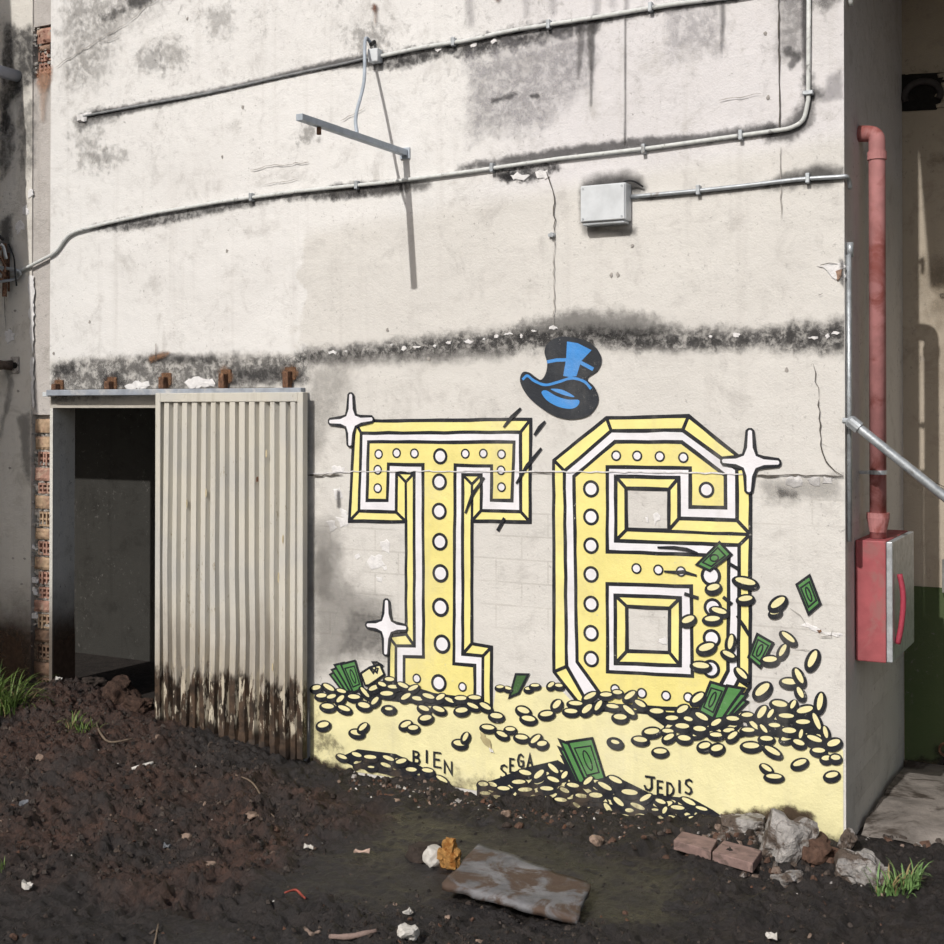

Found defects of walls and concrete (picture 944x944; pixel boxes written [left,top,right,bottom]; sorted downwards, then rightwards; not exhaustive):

damp [0,24,35,170]
damp [87,0,736,118]
damp [462,124,774,183]
damp [0,217,11,262]
rust [149,344,169,361]
mould [52,321,844,401]
crack [308,364,843,478]
peeling [326,487,349,533]